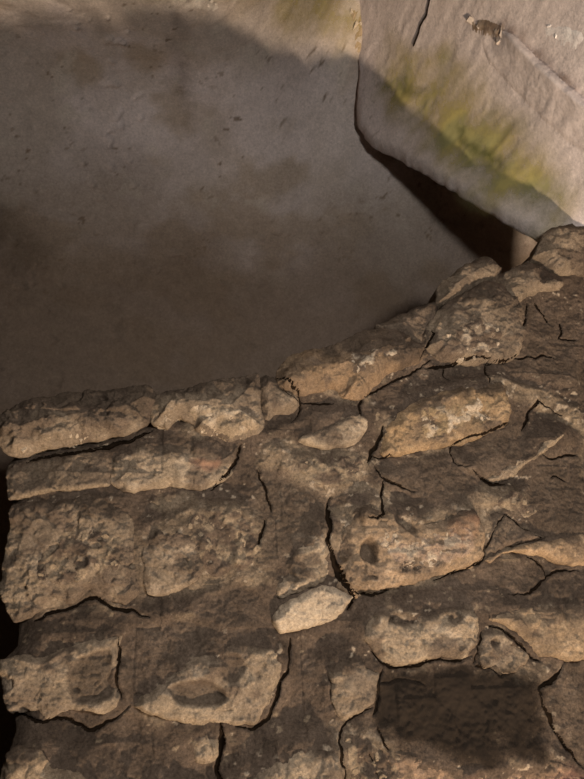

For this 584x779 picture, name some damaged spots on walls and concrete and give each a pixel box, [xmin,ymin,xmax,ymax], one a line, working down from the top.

crack [413,0,430,46]